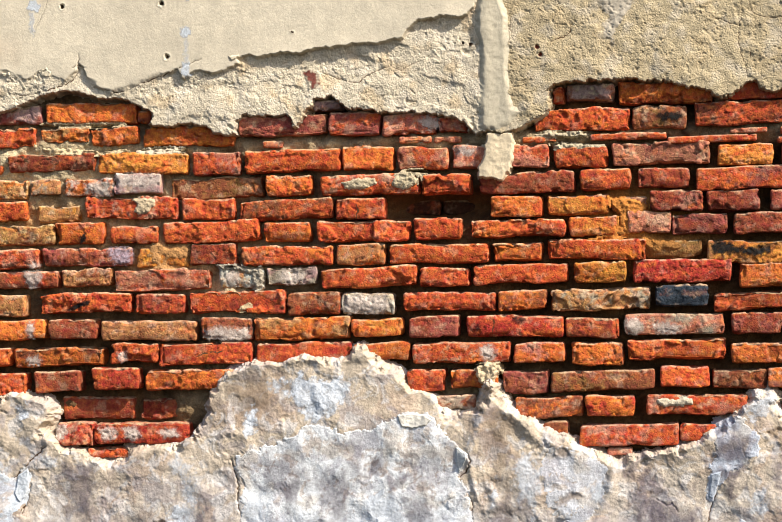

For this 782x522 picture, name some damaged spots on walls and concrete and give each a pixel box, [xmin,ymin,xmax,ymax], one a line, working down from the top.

crack [712,1,782,78]
flaking render [0,0,782,138]
peeling [0,467,32,522]
damp [55,425,68,440]
damp [100,426,142,440]
efflorescence [243,409,257,437]
efflorescence [267,370,351,423]
peeling [233,411,473,522]
damp [365,475,425,522]
damp [516,453,541,506]
peeling [540,441,608,522]
peeling [705,415,761,502]